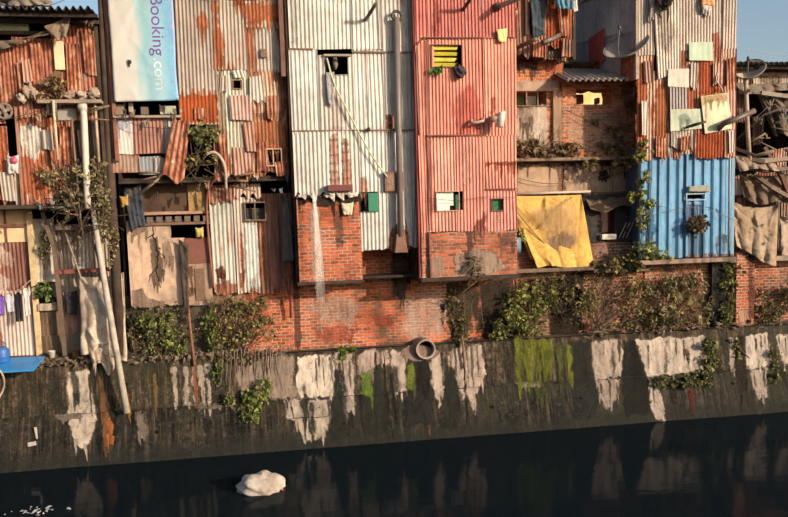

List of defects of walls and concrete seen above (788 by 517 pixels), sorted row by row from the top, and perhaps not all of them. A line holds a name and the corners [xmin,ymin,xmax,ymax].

rust [196,0,225,73]
rust [234,0,285,77]
rust [21,153,48,204]
rust [179,88,219,124]
rust [254,120,287,161]
rust [329,133,368,205]
rust [635,62,670,162]
rust [680,32,727,124]
rust [696,132,725,158]
crack [146,226,167,288]
leakage [518,272,597,419]
leakage [300,386,316,449]